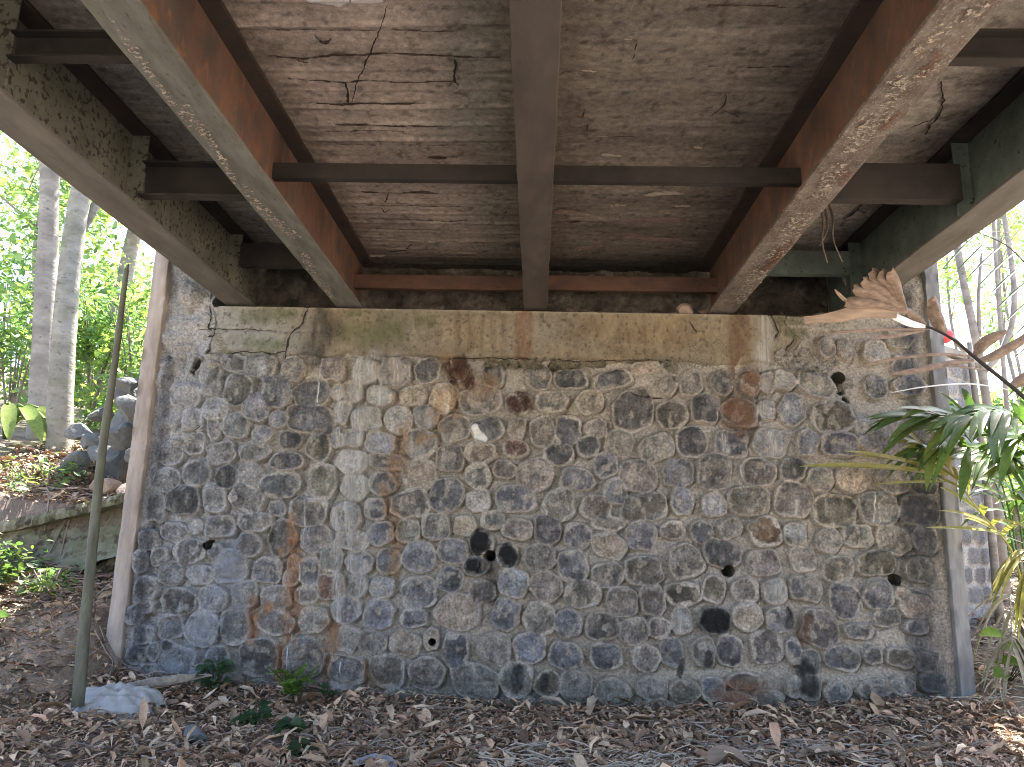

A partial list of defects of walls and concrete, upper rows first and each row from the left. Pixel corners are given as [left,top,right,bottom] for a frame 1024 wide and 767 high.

crack [345,5,388,106]
crack [450,59,459,86]
crack [914,81,945,135]
crack [199,308,308,359]